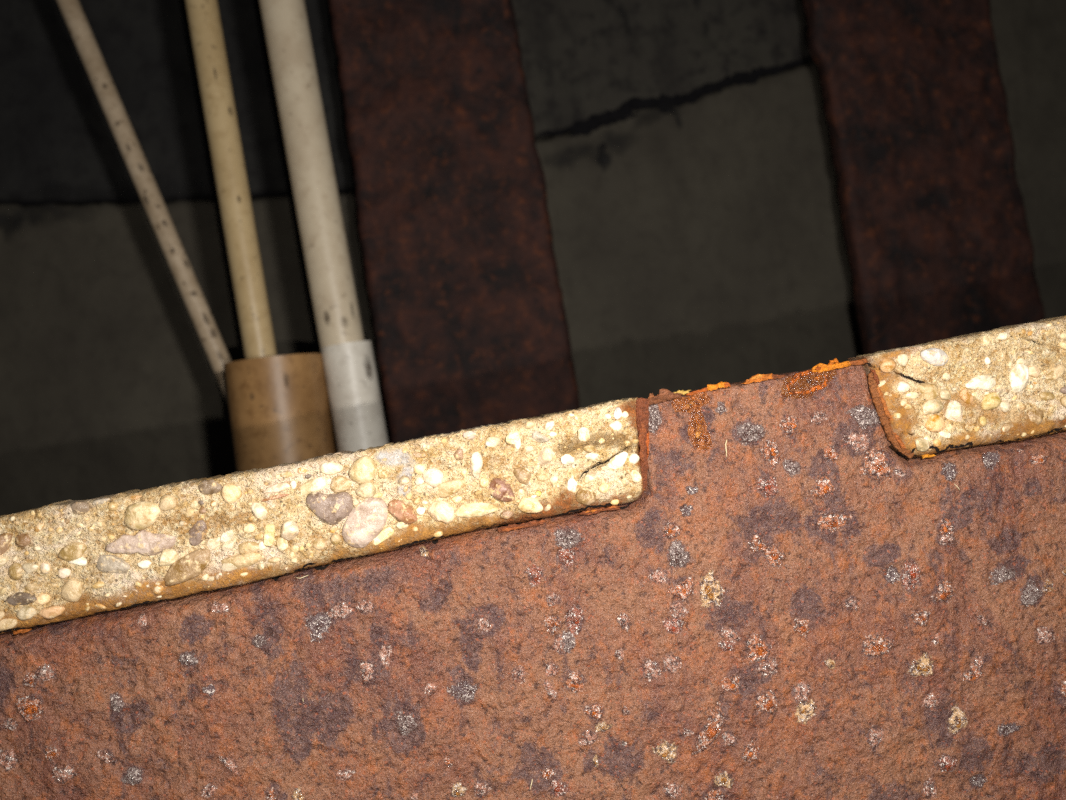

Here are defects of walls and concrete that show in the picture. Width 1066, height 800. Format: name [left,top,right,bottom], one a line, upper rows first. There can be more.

crack [535,56,812,165]
rust [781,369,838,399]
rust [824,349,1066,481]
rust [0,568,272,633]
rust [306,599,373,642]
rust [362,492,626,557]
rust [648,486,725,636]
rust [652,675,759,765]
rust [717,627,778,713]
rust [793,682,817,725]
rust [906,579,957,678]
rust [946,704,968,733]